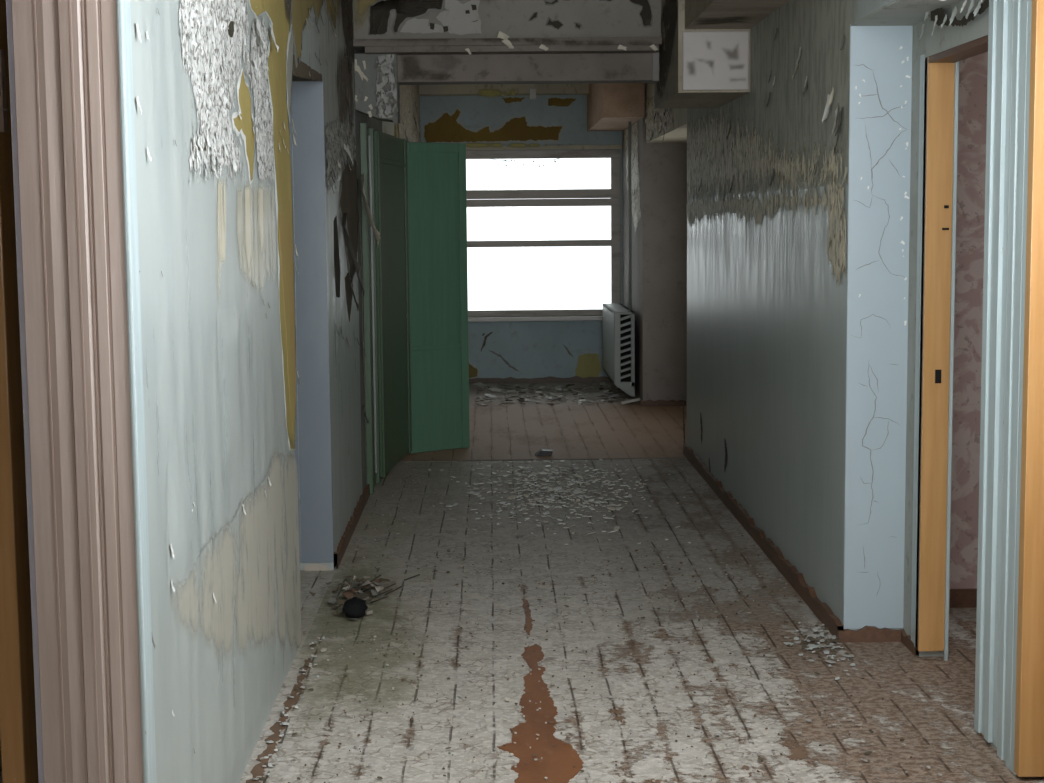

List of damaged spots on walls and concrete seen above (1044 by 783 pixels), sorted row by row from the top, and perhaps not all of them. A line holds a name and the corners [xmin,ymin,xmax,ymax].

spalling [528,0,582,30]
spalling [629,0,653,28]
peeling [548,98,576,107]
peeling [624,91,674,232]
peeling [686,87,848,286]
crack [855,64,906,277]
peeling [171,0,564,650]
crack [858,364,898,594]
peeling [246,659,312,783]
peeling [497,599,584,783]
peeling [608,707,631,726]